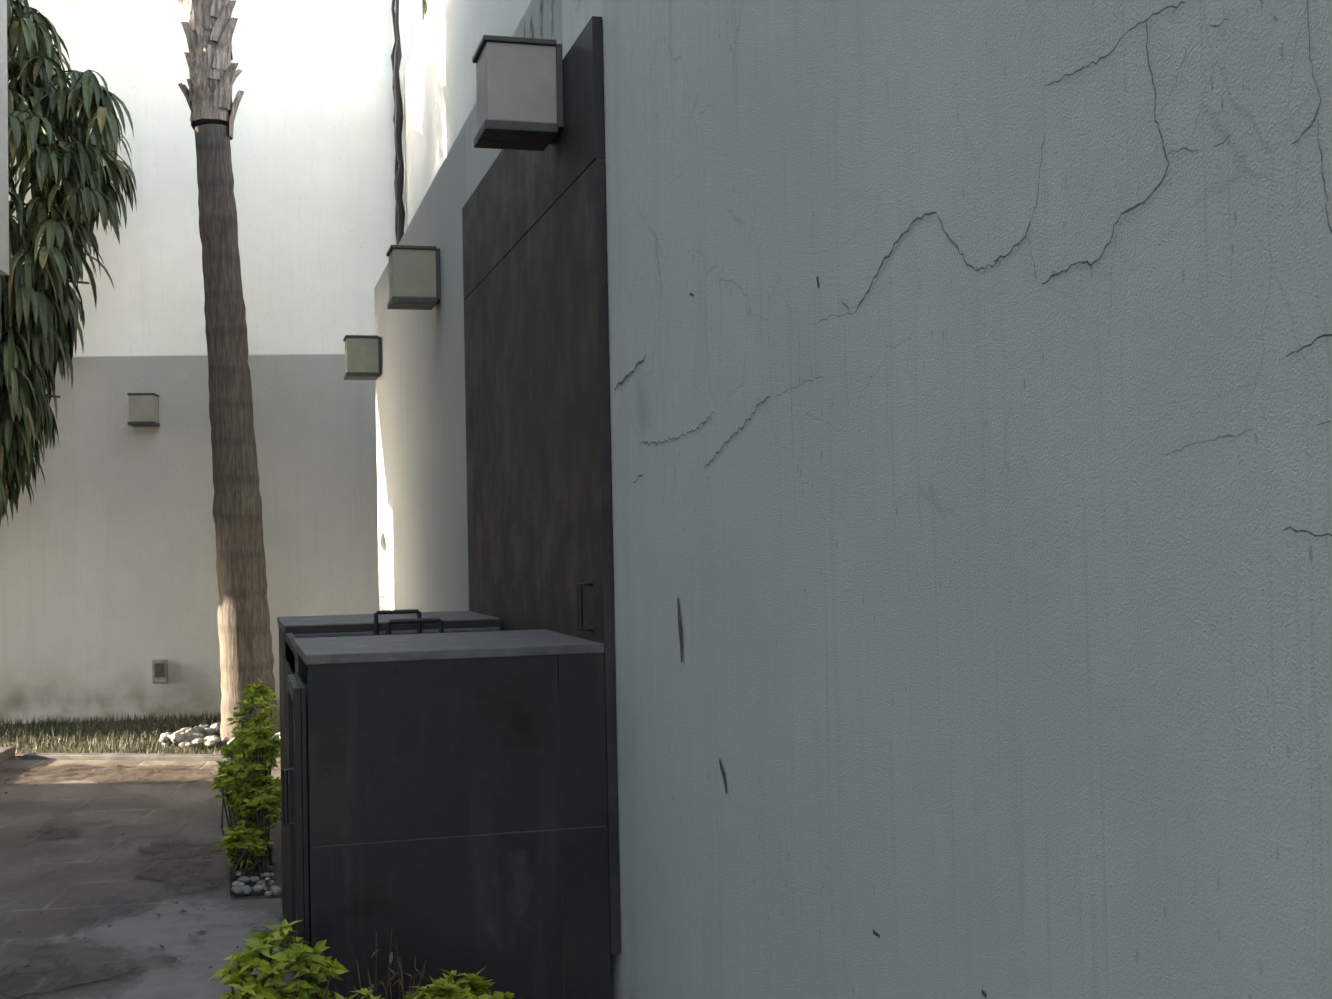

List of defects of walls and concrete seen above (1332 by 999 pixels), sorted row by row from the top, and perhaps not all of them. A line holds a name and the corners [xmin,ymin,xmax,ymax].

crack [820,1,1230,321]
crack [1292,0,1332,233]
crack [615,355,646,390]
crack [1286,334,1332,357]
crack [634,378,817,483]
crack [1284,527,1332,537]